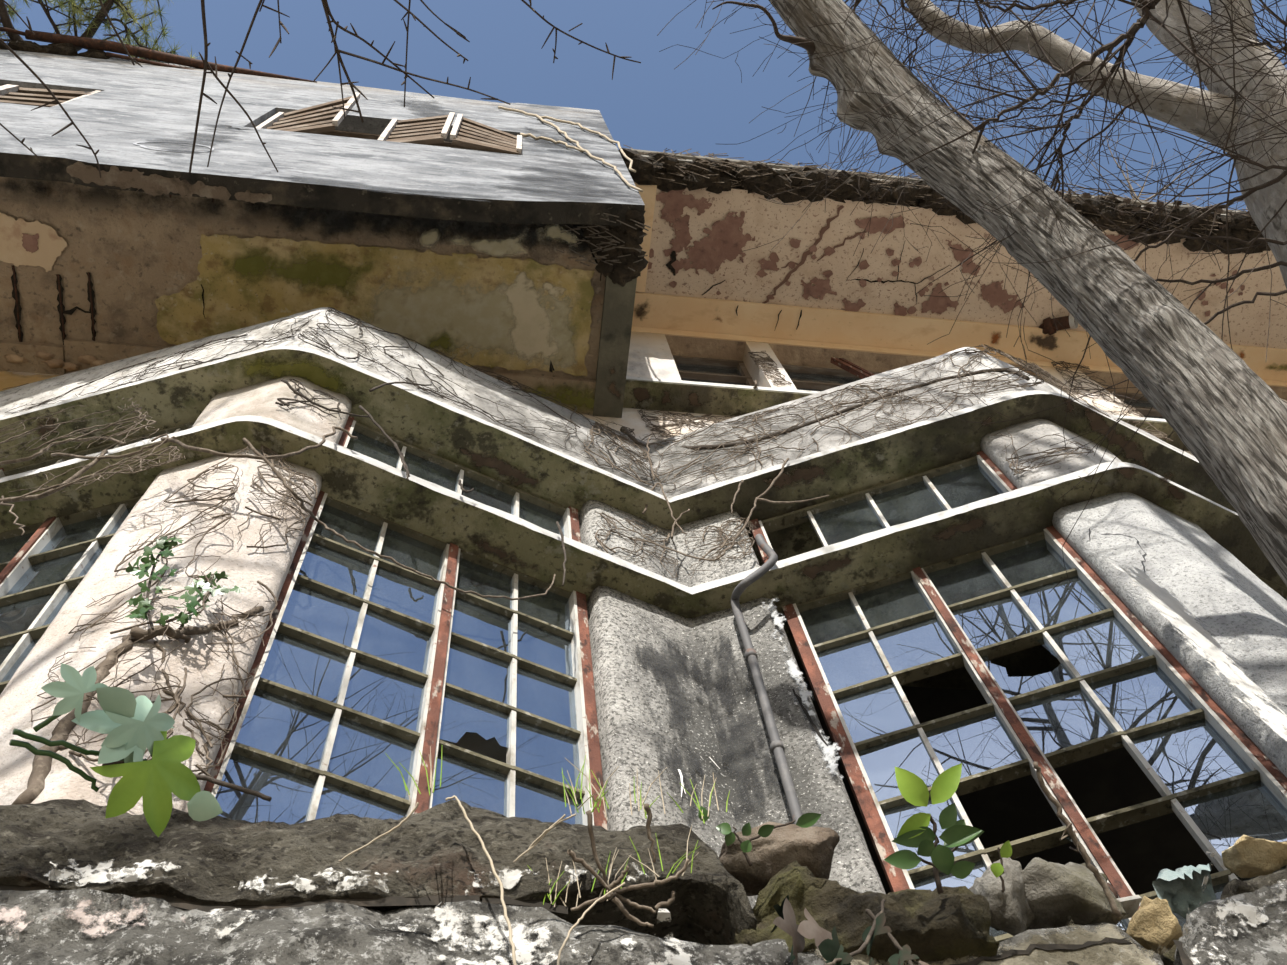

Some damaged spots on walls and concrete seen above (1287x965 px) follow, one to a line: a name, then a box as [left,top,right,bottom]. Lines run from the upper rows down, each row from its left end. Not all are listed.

peeling [22,233,39,253]
spalling [4,265,106,371]
crack [64,306,90,315]
crack [666,251,676,276]
spalling [556,187,922,312]
crack [702,205,949,330]
water stain [635,635,784,824]